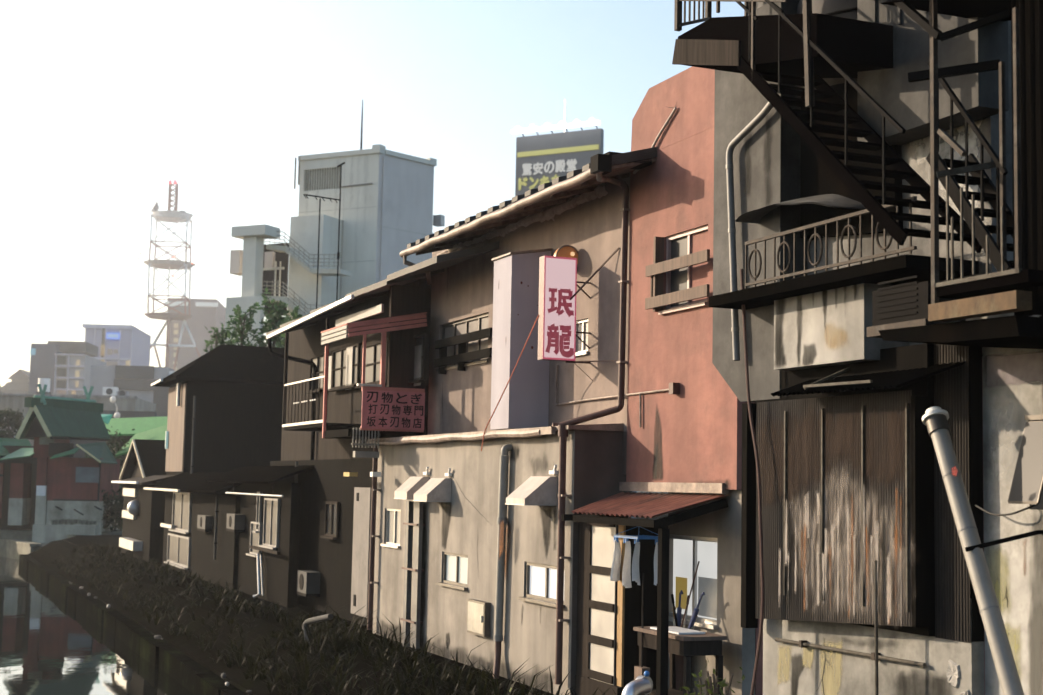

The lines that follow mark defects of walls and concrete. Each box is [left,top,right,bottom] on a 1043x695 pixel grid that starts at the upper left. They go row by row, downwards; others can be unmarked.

corrosion [888,490,901,623]
water stain [1006,518,1043,695]